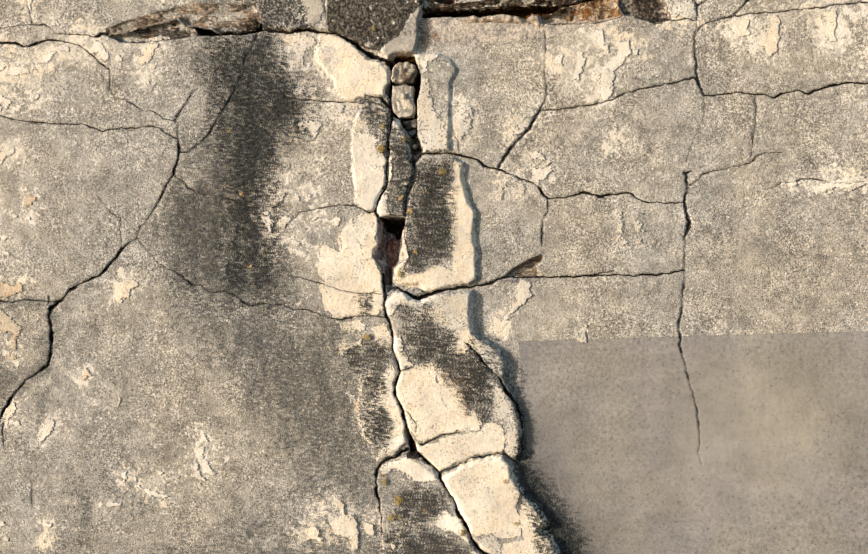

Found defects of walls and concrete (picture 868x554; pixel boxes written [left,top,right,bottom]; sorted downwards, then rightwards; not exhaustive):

spalling [50,2,263,85]
spalling [281,0,697,113]
peeling [291,120,322,139]
spalling [410,137,423,162]
crack [0,0,525,554]
water stain [143,21,591,554]
spalling [374,217,409,296]
crack [396,0,868,464]